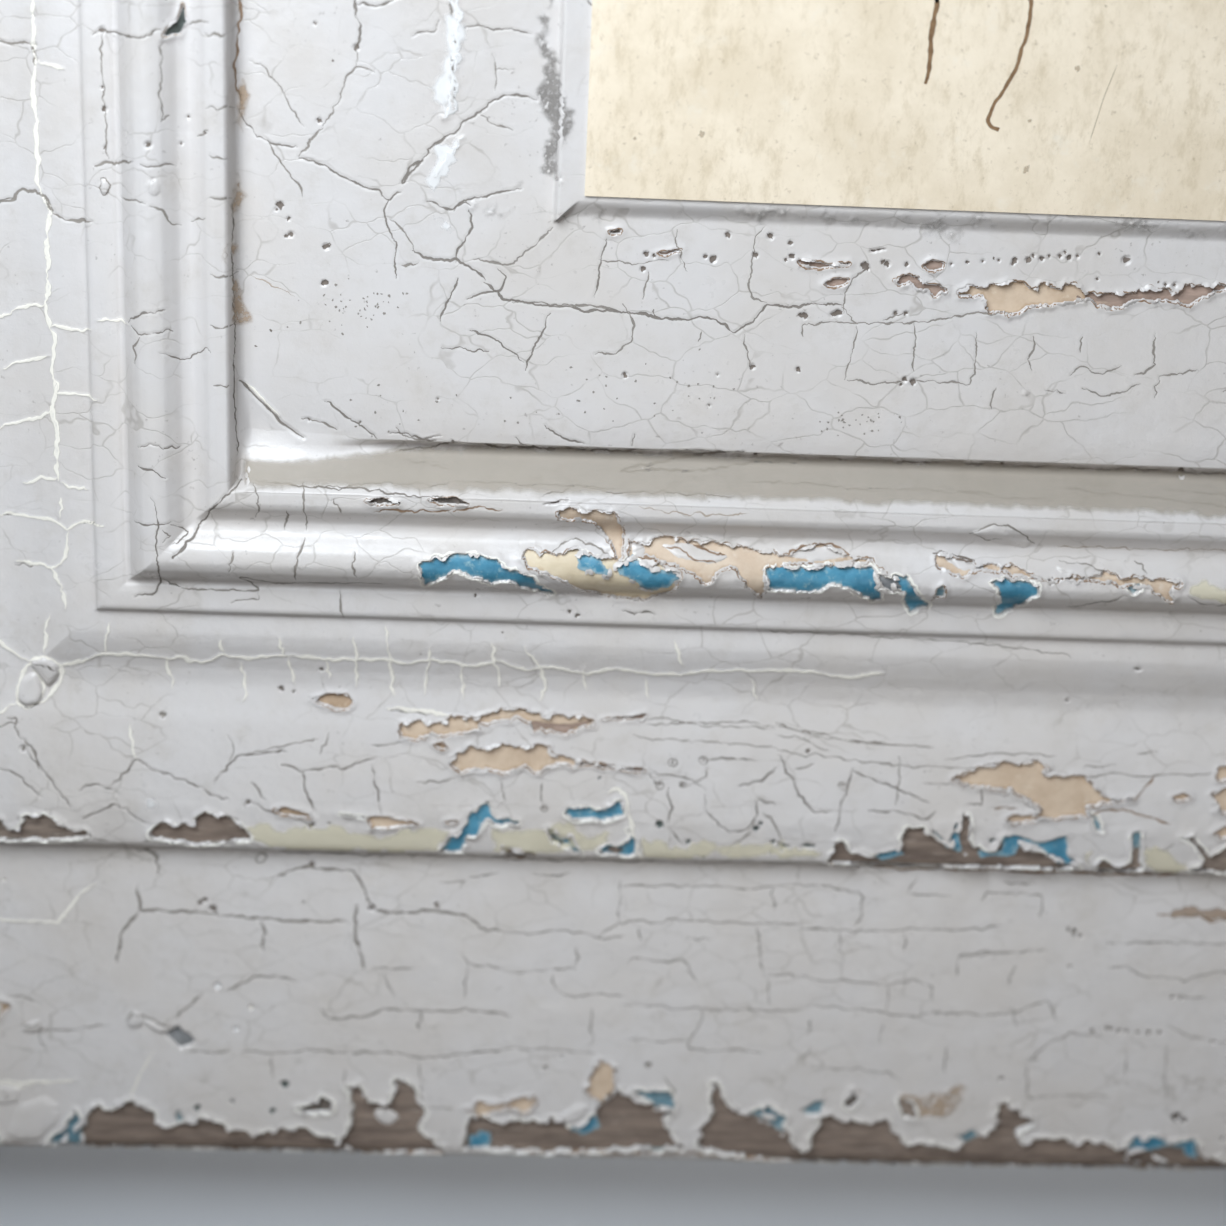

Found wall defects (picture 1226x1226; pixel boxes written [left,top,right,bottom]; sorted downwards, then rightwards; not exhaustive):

peeling [784,241,1226,318]
crack [1027,336,1199,398]
crack [0,0,1071,859]
crack [1071,467,1226,492]
peeling [417,501,1183,619]
crack [1058,545,1226,573]
peeling [397,707,648,776]
peeling [146,810,254,848]
peeling [437,801,522,855]
peeling [545,787,642,860]
peeling [803,760,1171,874]
peeling [43,1060,1226,1171]